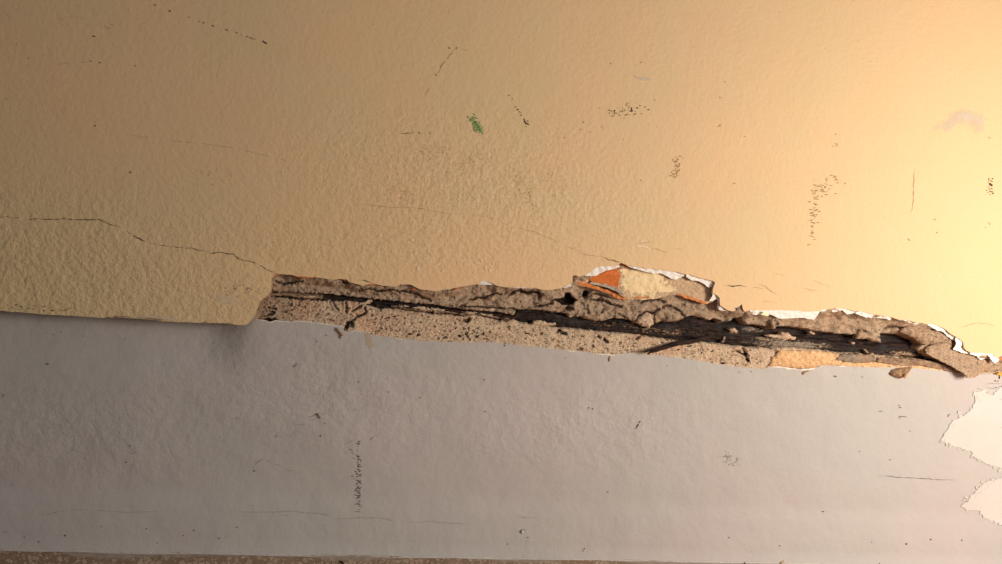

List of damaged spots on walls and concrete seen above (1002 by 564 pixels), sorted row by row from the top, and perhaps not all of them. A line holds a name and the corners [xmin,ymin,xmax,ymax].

crack [0,216,272,272]
spalling [218,264,1002,389]